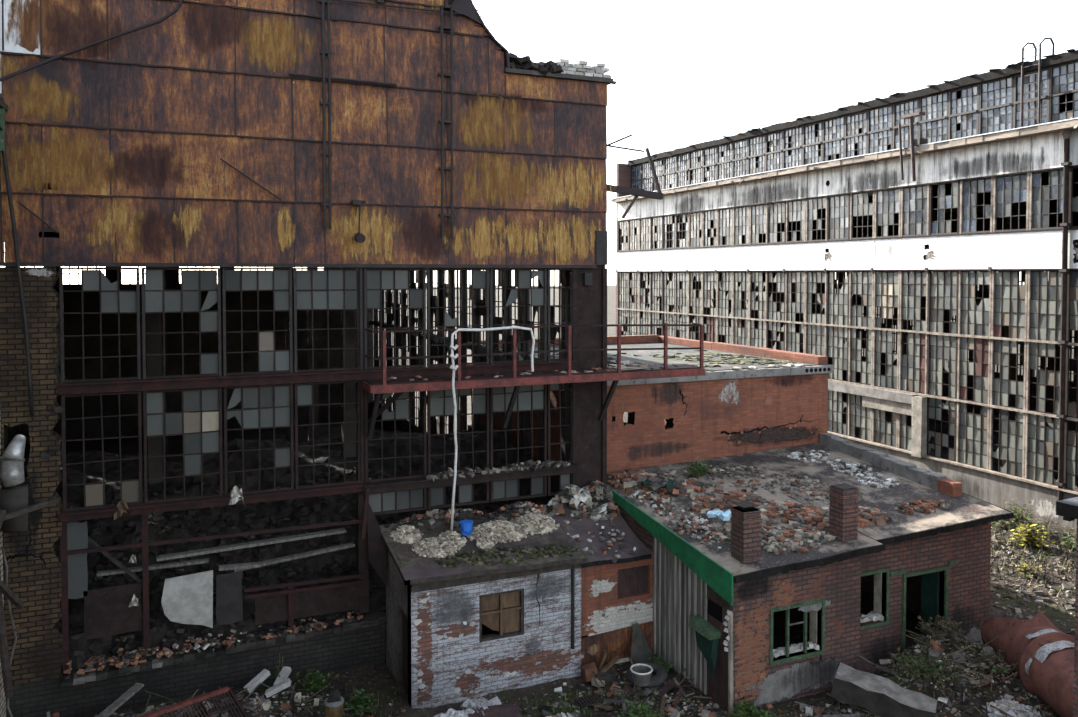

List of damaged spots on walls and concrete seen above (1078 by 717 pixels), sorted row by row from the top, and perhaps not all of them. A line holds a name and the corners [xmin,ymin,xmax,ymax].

rust [0,0,58,77]
rust [187,0,249,52]
rust [486,94,544,111]
rust [111,147,180,186]
water stain [843,174,898,193]
water stain [954,149,1044,177]
rust [136,213,182,256]
crack [721,414,819,441]
flaking render [589,579,617,597]
flaking render [582,598,653,636]
peeling [413,592,479,709]
peeling [454,644,585,697]